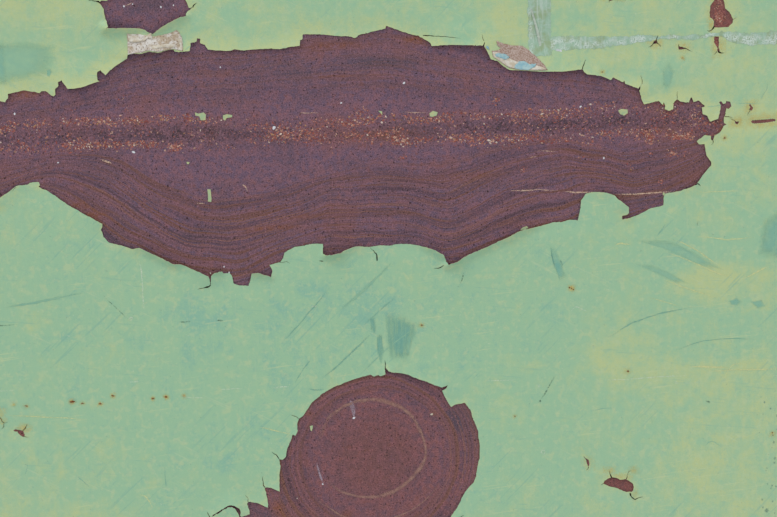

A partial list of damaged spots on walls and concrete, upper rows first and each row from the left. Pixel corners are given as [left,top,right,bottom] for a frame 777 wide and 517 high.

peeling [0,0,777,303]
peeling [0,409,33,441]
peeling [194,350,496,517]
peeling [579,451,642,501]